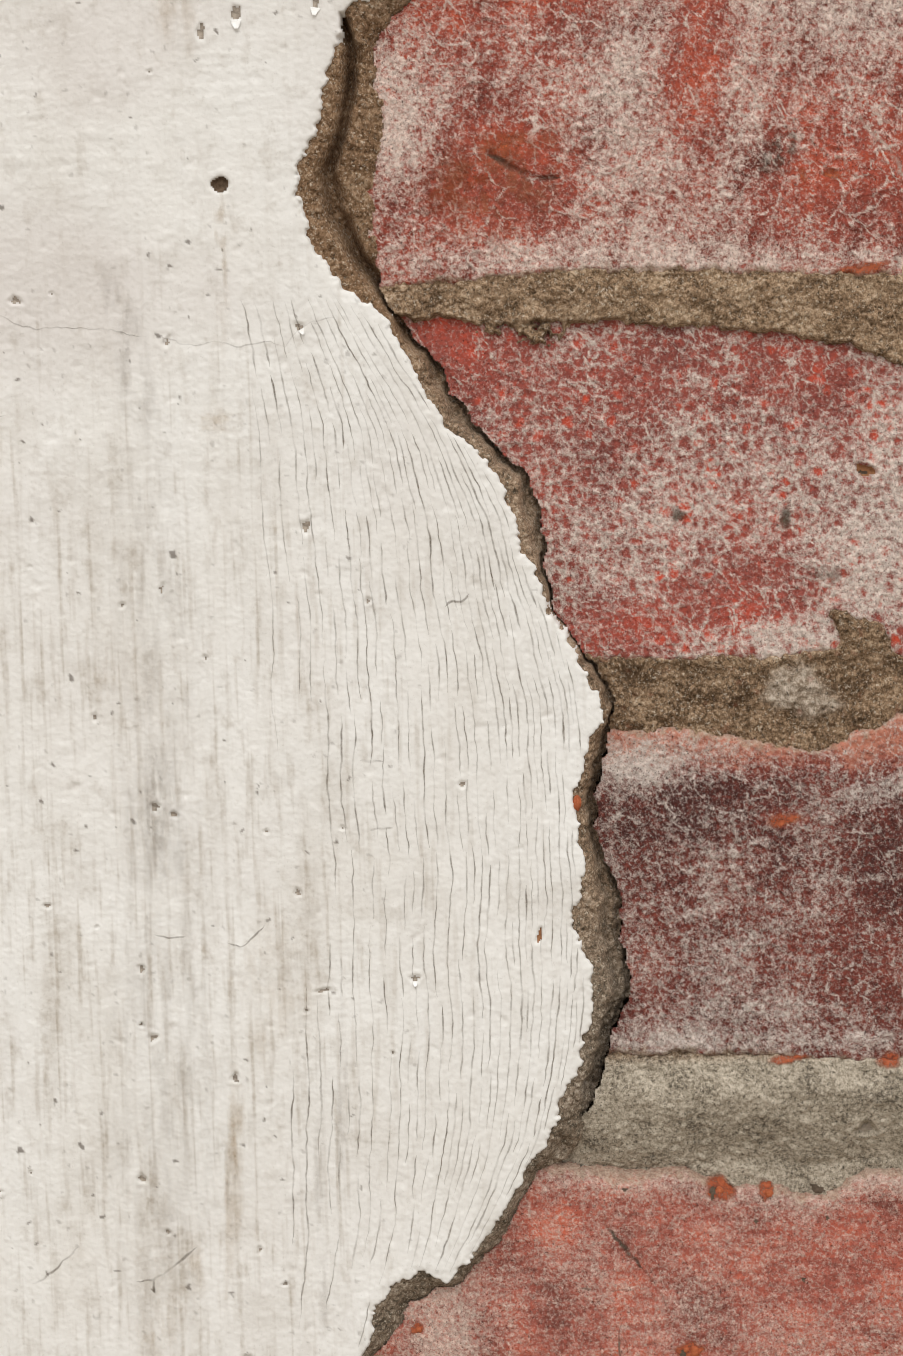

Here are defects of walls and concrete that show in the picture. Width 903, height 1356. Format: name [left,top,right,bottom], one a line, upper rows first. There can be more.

spalling [837,262,887,275]
spalling [857,464,875,476]
spalling [295,0,631,1356]
spalling [773,1055,806,1064]
spalling [878,1052,899,1067]
spalling [707,1175,735,1201]
spalling [759,1181,774,1201]
spalling [675,1342,704,1356]